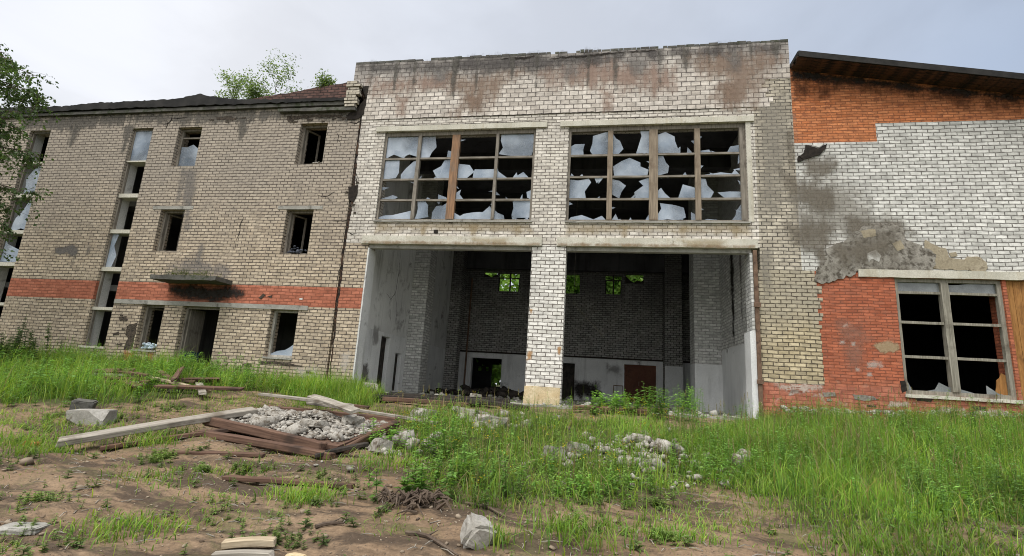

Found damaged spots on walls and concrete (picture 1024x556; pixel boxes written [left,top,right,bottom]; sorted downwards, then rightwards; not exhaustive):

damp [362,42,782,115]
damp [23,108,356,152]
damp [786,159,837,265]
damp [848,217,903,234]
peeling [814,223,988,284]
spalling [113,314,137,349]